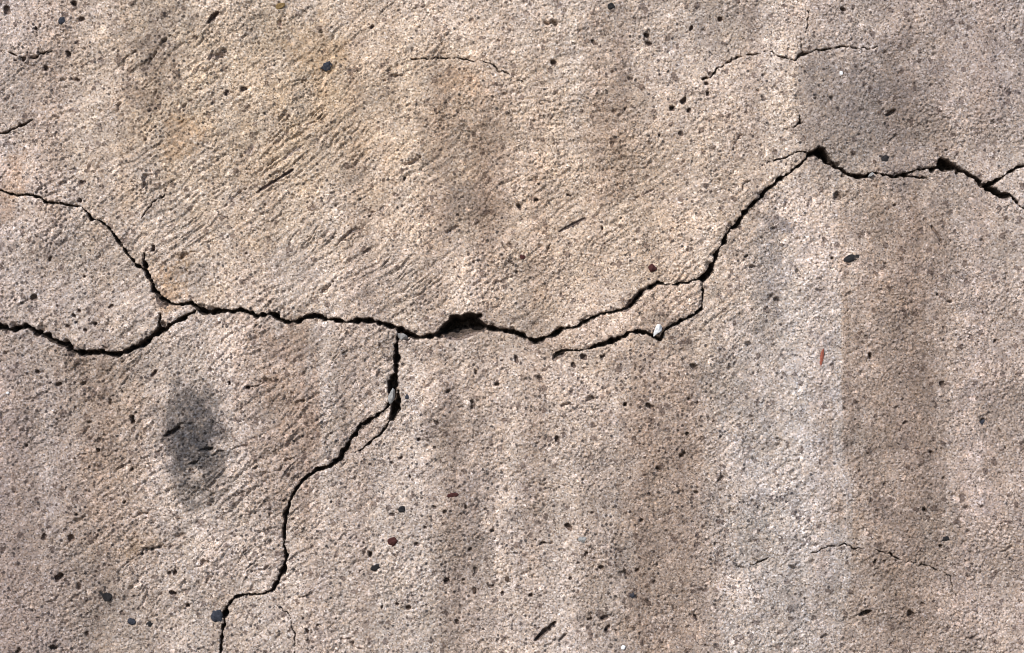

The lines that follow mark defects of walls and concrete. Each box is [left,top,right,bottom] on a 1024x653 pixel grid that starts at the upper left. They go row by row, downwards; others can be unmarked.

crack [701,10,875,81]
crack [487,116,1024,354]
water stain [166,394,222,502]
crack [0,190,440,653]
crack [812,543,956,595]